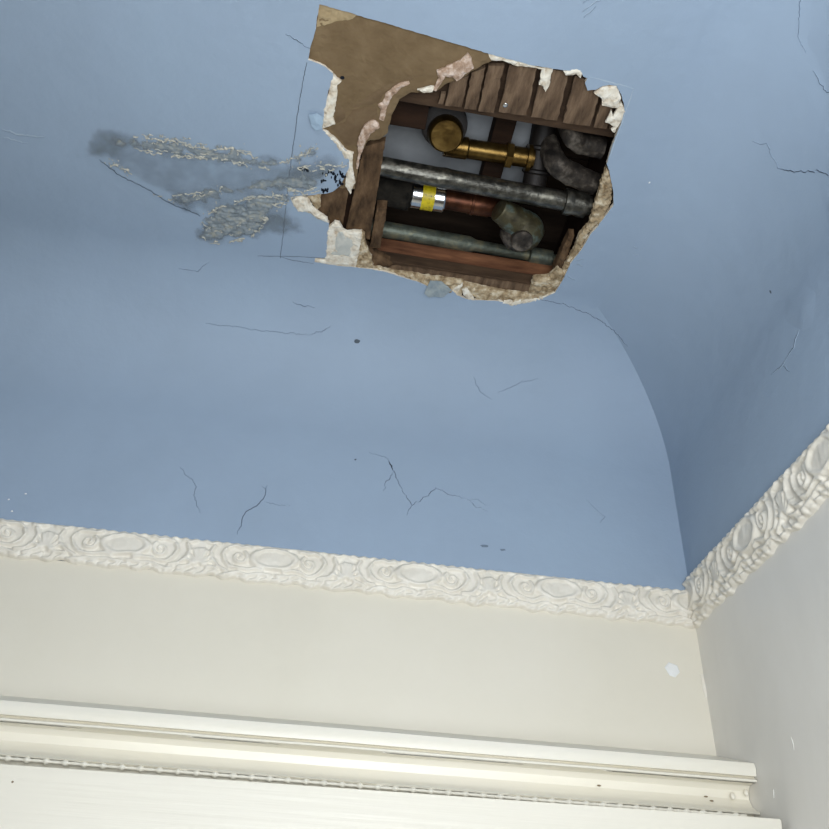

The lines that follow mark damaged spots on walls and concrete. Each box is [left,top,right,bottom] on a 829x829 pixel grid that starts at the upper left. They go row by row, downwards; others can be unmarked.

spalling [594,85,625,133]
leakage [320,170,346,194]
spalling [100,4,612,306]
crack [752,141,829,176]
crack [369,452,488,515]
crack [237,486,291,534]